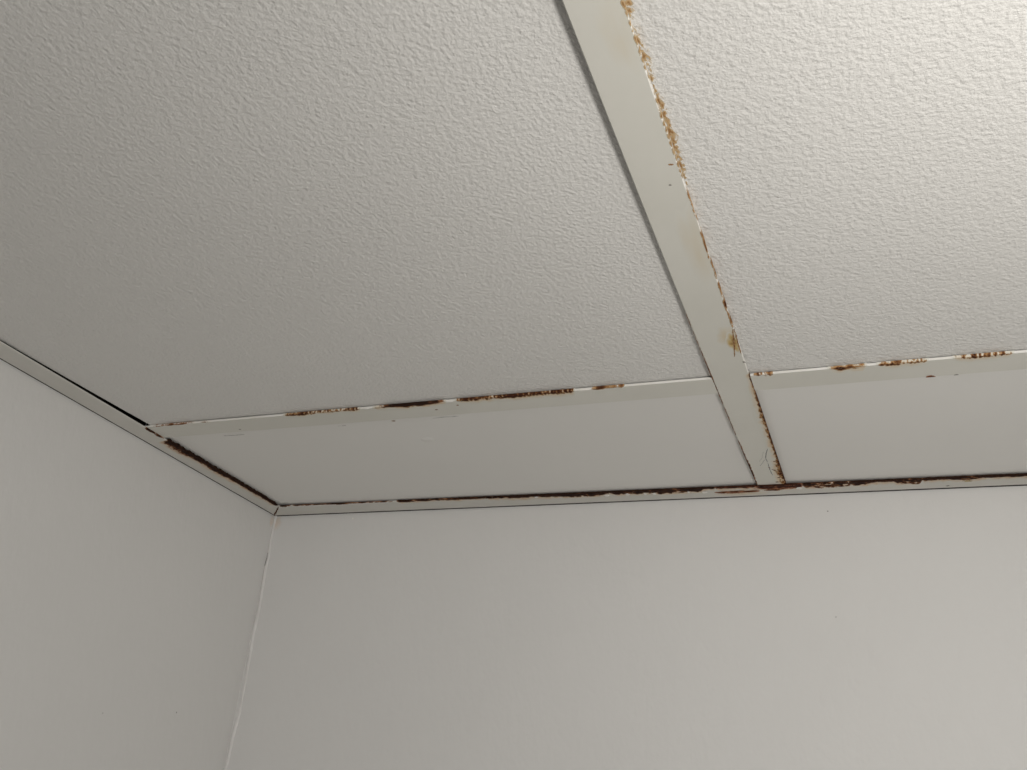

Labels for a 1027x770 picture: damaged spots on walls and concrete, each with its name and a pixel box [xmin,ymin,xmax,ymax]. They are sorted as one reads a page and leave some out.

rust [145,0,1027,515]